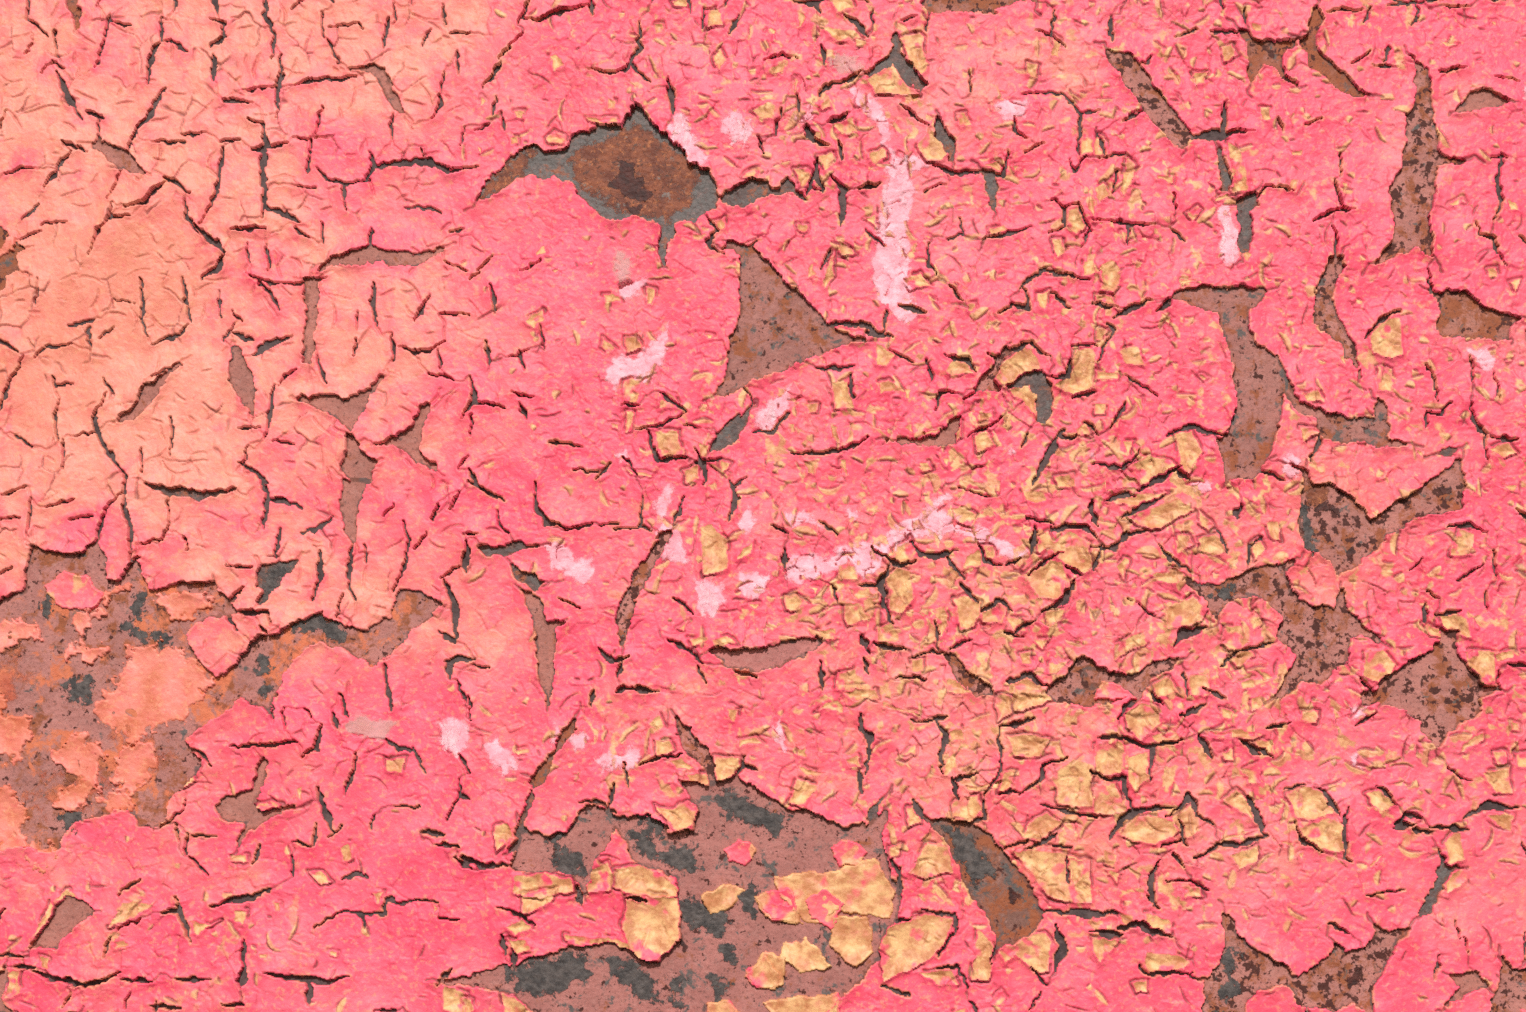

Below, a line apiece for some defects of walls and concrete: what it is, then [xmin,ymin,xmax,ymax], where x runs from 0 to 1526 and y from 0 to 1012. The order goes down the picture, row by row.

crack [0,0,758,718]
corrosion [477,147,538,200]
corrosion [566,123,701,224]
peeling [477,105,897,397]
crack [745,389,869,455]
crack [758,0,930,270]
peeling [1100,253,1526,793]
peeling [1375,55,1466,265]
crack [0,664,509,1012]
peeling [437,524,1273,1012]
peeling [1133,833,1466,1012]
crack [1377,768,1526,869]